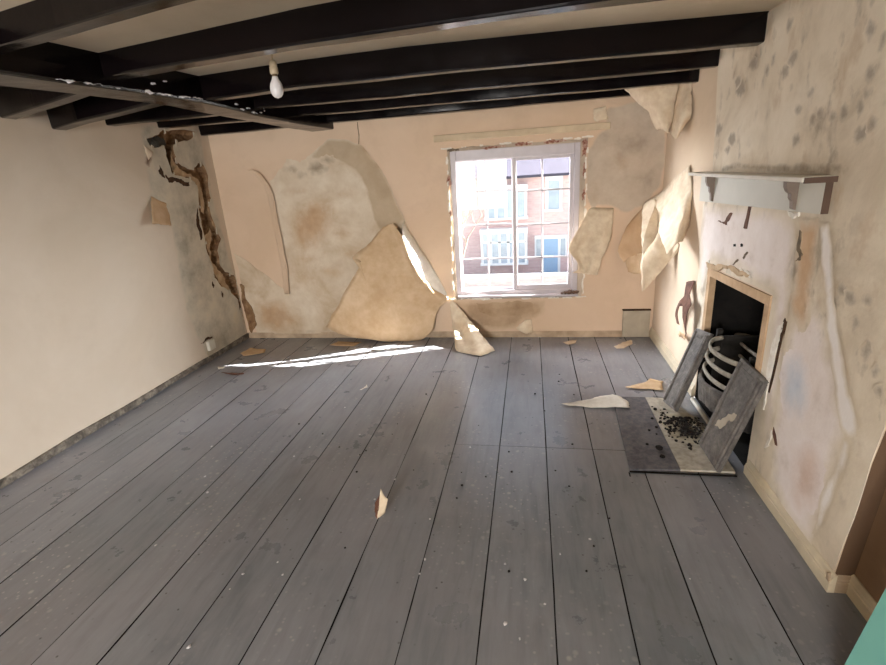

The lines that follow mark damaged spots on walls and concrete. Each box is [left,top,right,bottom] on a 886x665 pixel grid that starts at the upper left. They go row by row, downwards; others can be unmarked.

mould [734,48,800,99]
mould [790,16,886,150]
leakage [715,122,850,176]
crack [145,128,257,333]
peeling [138,123,406,358]
leakage [252,297,321,334]
leakage [278,154,360,285]
leakage [476,301,534,317]
peeling [441,101,667,332]
peeling [692,0,886,572]
crack [762,318,787,448]